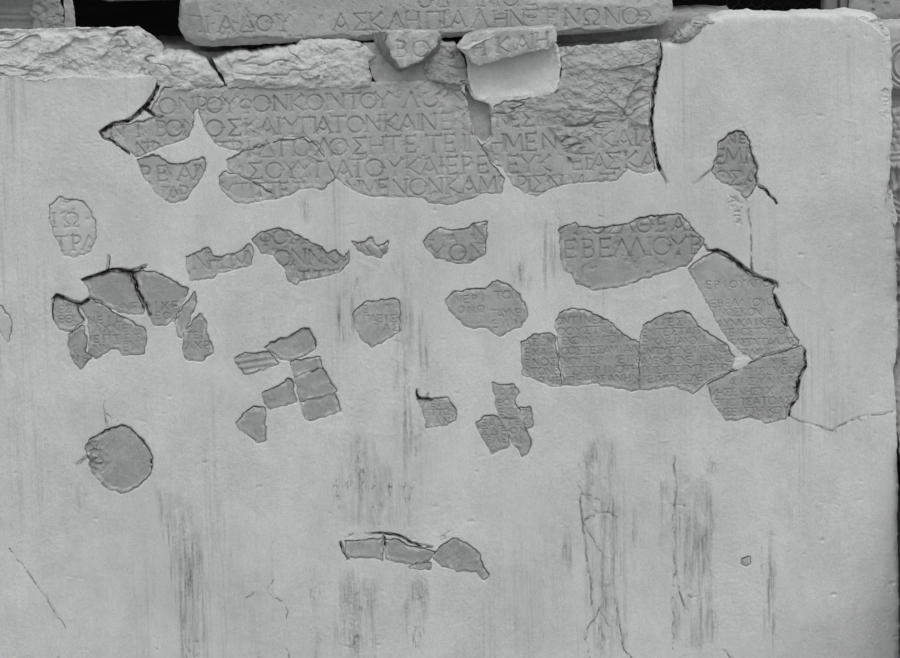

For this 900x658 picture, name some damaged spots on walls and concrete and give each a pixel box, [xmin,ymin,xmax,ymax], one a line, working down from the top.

crack [650,42,666,182]
crack [788,350,892,431]
crack [8,548,66,629]
crack [577,482,632,658]